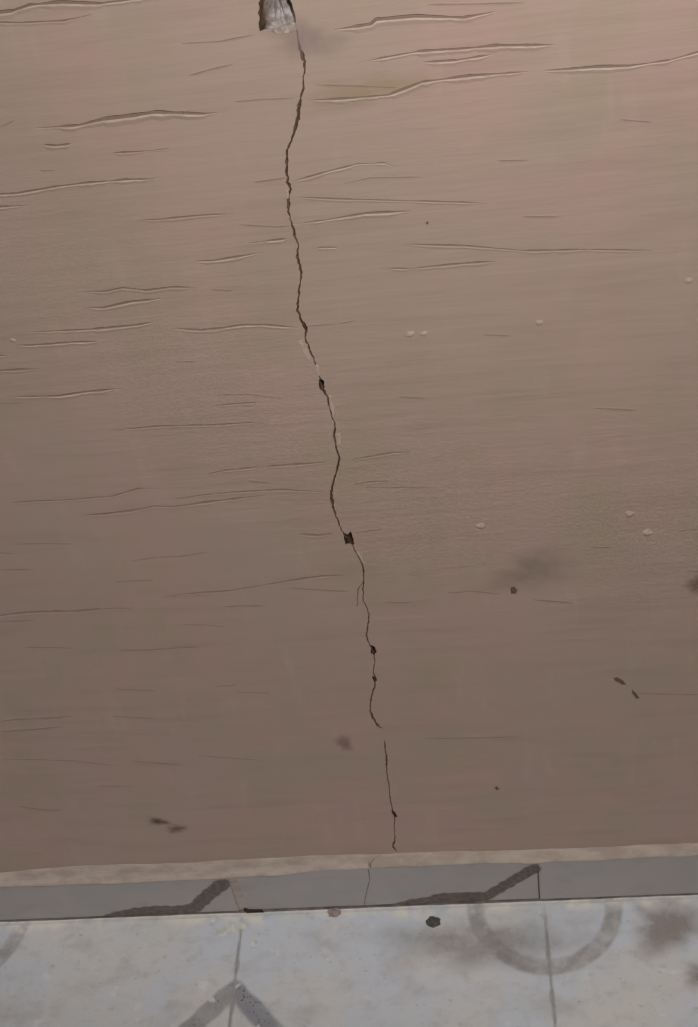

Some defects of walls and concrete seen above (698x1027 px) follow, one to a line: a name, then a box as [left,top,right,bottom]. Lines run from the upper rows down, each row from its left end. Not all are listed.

crack [285,30,397,905]